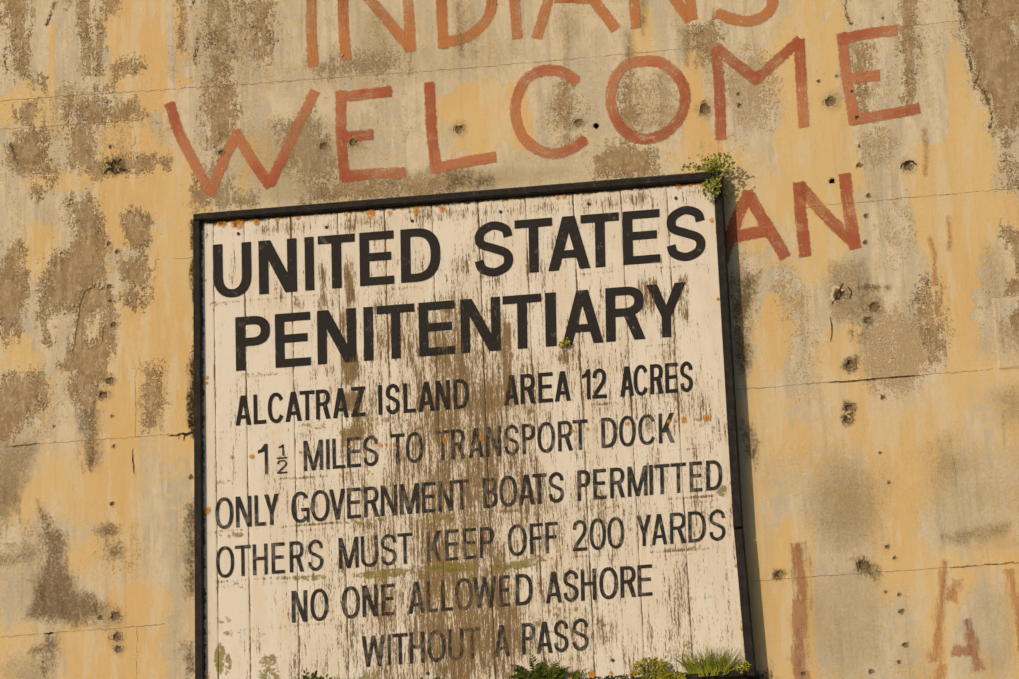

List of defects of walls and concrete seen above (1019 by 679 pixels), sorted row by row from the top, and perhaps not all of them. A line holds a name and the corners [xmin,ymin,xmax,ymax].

peeling [0,0,174,449]
spalling [830,284,852,306]
spalling [859,298,888,330]
peeling [908,271,956,372]
spalling [841,354,861,375]